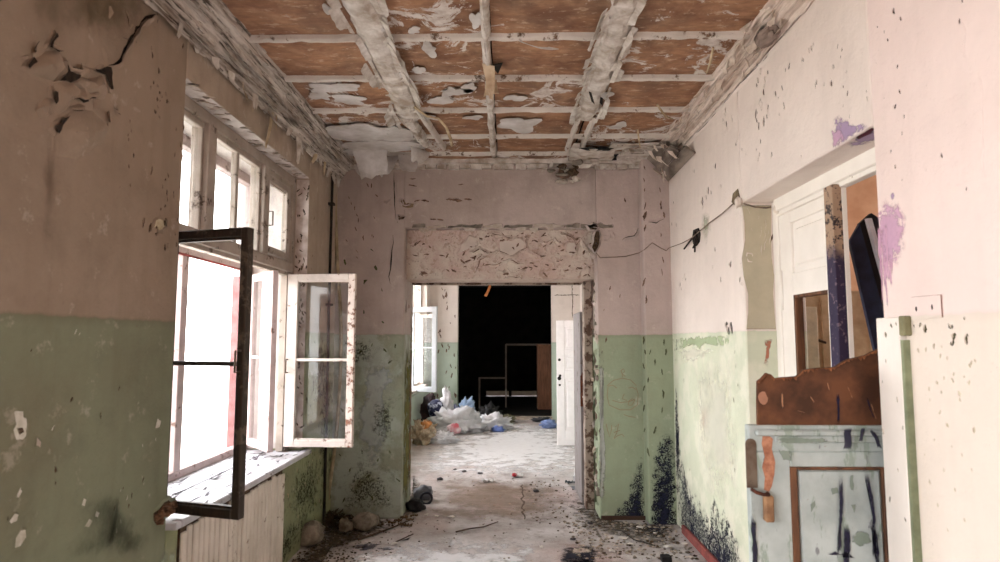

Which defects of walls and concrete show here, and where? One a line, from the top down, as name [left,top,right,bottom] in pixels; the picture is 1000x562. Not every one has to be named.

spalling [44,30,59,51]
spalling [20,53,38,71]
spalling [47,57,114,104]
crack [64,5,160,122]
spalling [48,113,70,136]
peeling [152,0,615,528]
peeling [12,410,42,449]